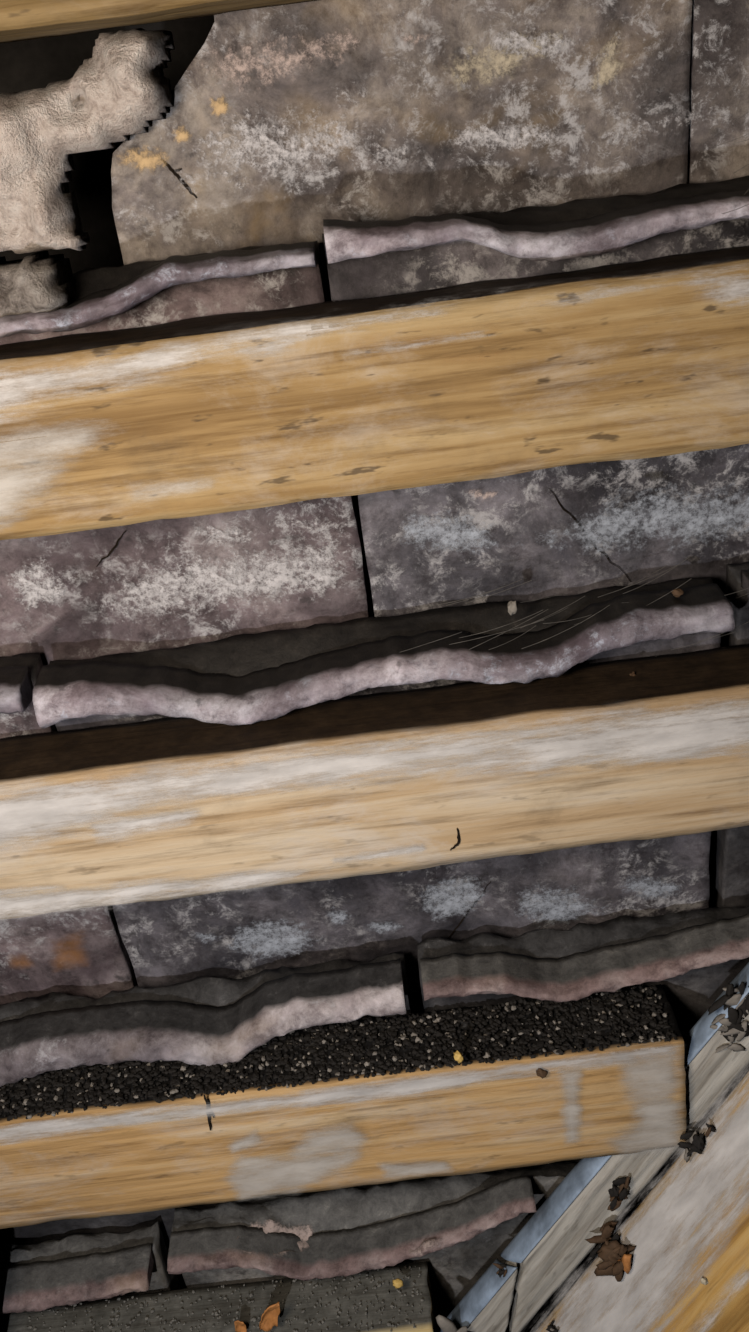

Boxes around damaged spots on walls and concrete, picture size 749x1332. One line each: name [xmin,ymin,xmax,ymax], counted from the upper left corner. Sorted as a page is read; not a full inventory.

leakage [454,32,573,83]
leakage [176,109,353,185]
leakage [455,124,550,149]
leakage [404,515,492,552]
leakage [575,494,749,552]
leakage [12,564,63,609]
leakage [112,527,345,616]
leakage [0,702,749,841]
leakage [0,873,292,917]
leakage [427,879,484,917]
leakage [234,922,308,956]
leakage [0,1046,749,1332]